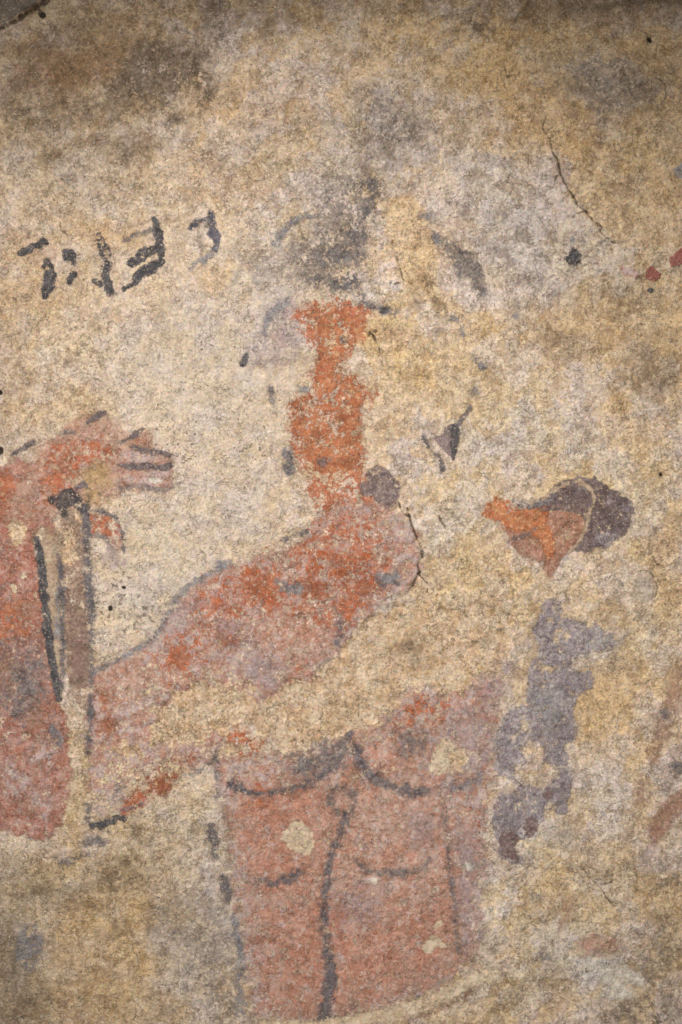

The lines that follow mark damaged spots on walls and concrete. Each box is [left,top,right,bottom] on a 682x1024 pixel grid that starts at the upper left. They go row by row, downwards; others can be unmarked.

crack [542,122,616,243]
crack [398,502,428,592]